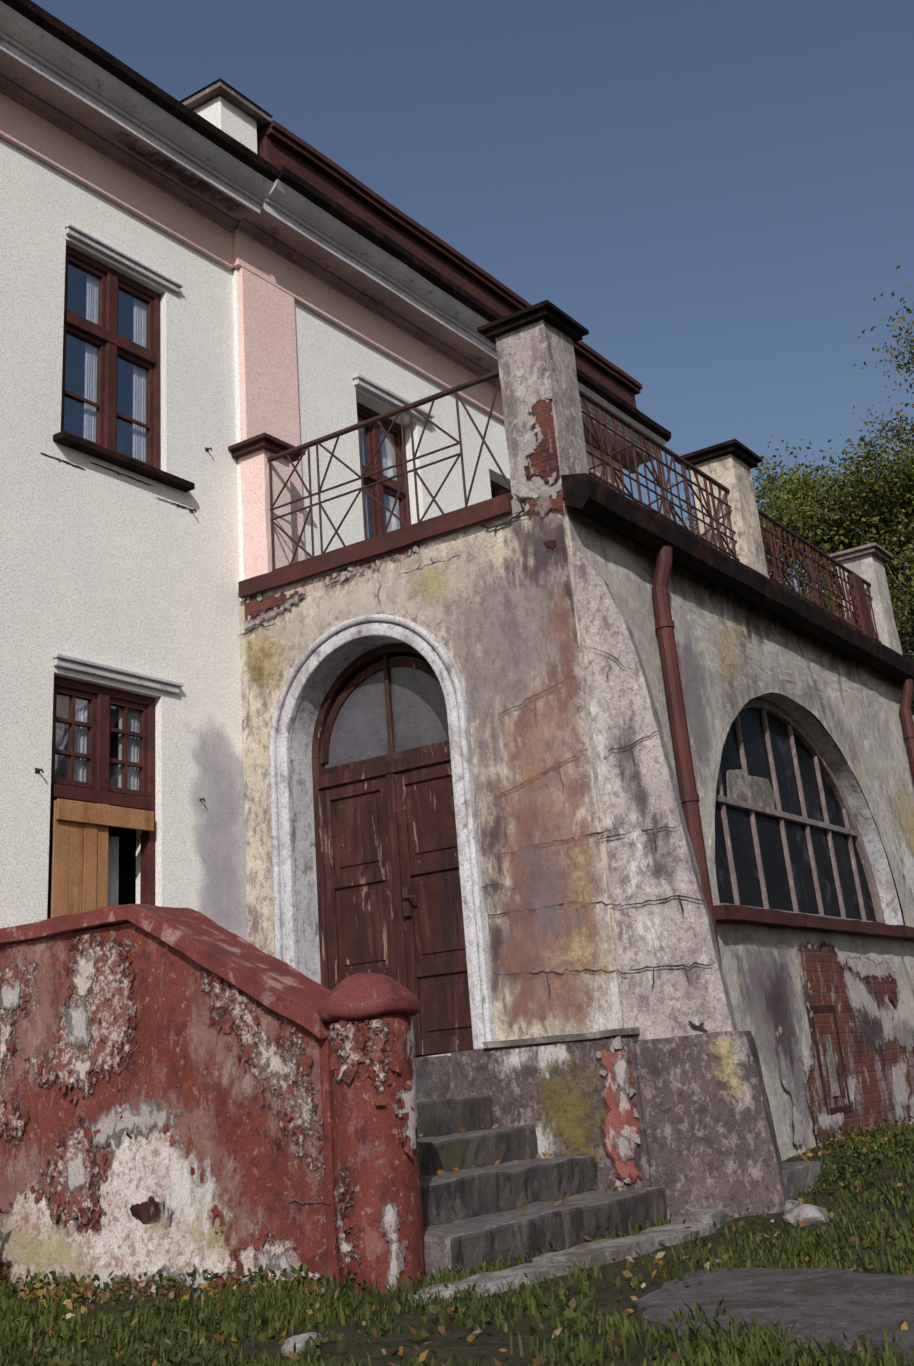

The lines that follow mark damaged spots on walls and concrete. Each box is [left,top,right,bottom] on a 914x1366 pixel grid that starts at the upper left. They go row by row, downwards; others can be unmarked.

spalling [518,392,565,517]
spalling [244,589,306,631]
crack [498,643,629,716]
crack [560,731,658,790]
crack [571,826,678,851]
crack [481,847,705,918]
crack [495,962,712,997]
spalling [775,939,914,1146]
spalling [0,933,418,1295]
damp [504,1045,615,1161]
peeling [596,1036,642,1191]